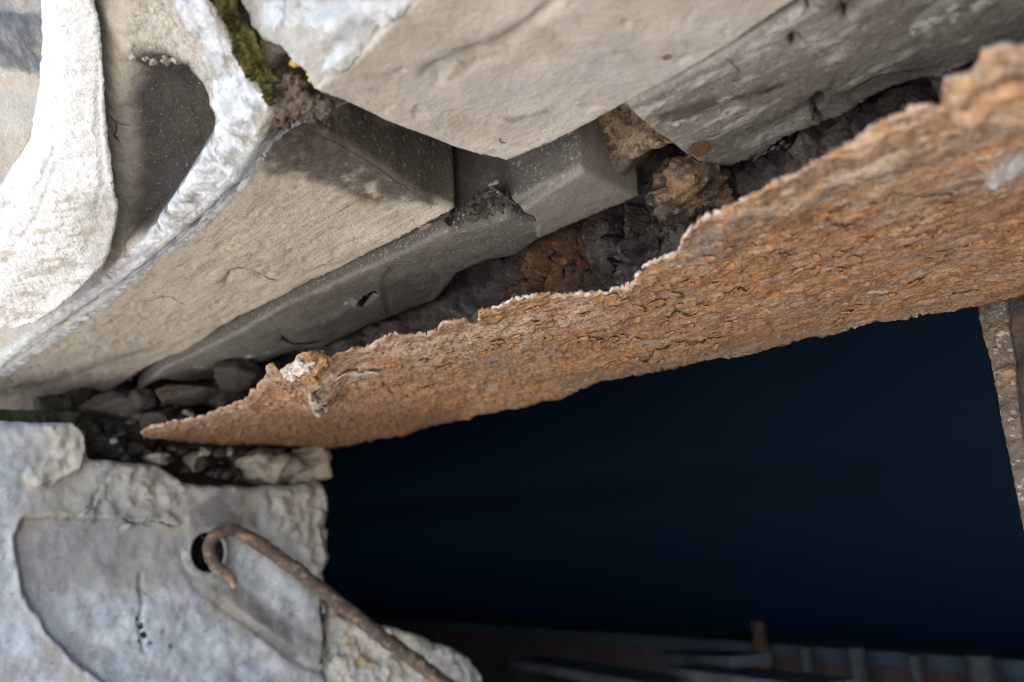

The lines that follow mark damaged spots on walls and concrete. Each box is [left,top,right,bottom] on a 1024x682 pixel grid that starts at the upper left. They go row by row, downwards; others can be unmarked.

spalling [444,180,538,231]
corrosion [620,142,734,263]
corrosion [505,219,604,294]
corrosion [889,202,965,306]
corrosion [475,234,802,358]
peeling [308,391,335,417]
peeling [335,369,384,382]
spalling [26,425,86,487]